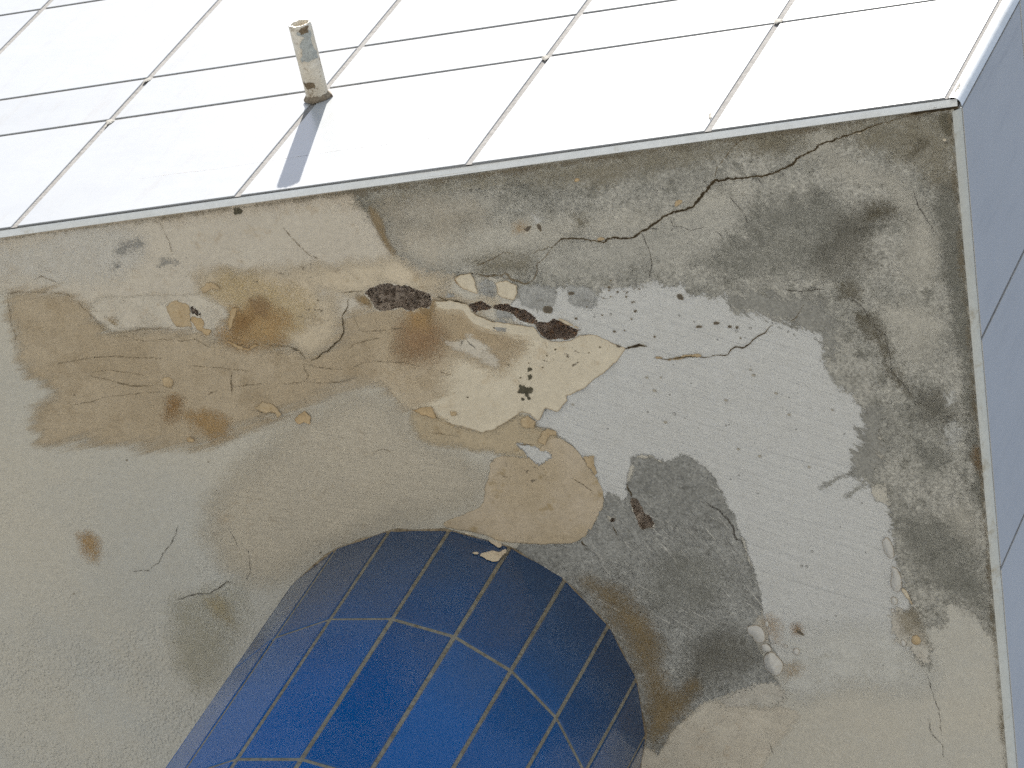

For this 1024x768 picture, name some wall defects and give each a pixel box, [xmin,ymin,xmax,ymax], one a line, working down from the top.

crack [476,106,959,285]
peeling [167,300,211,336]
leakage [0,222,528,456]
peeling [335,110,995,672]
leakage [350,112,992,622]
crack [616,289,914,398]
peeling [514,453,781,757]
leakage [574,542,775,753]